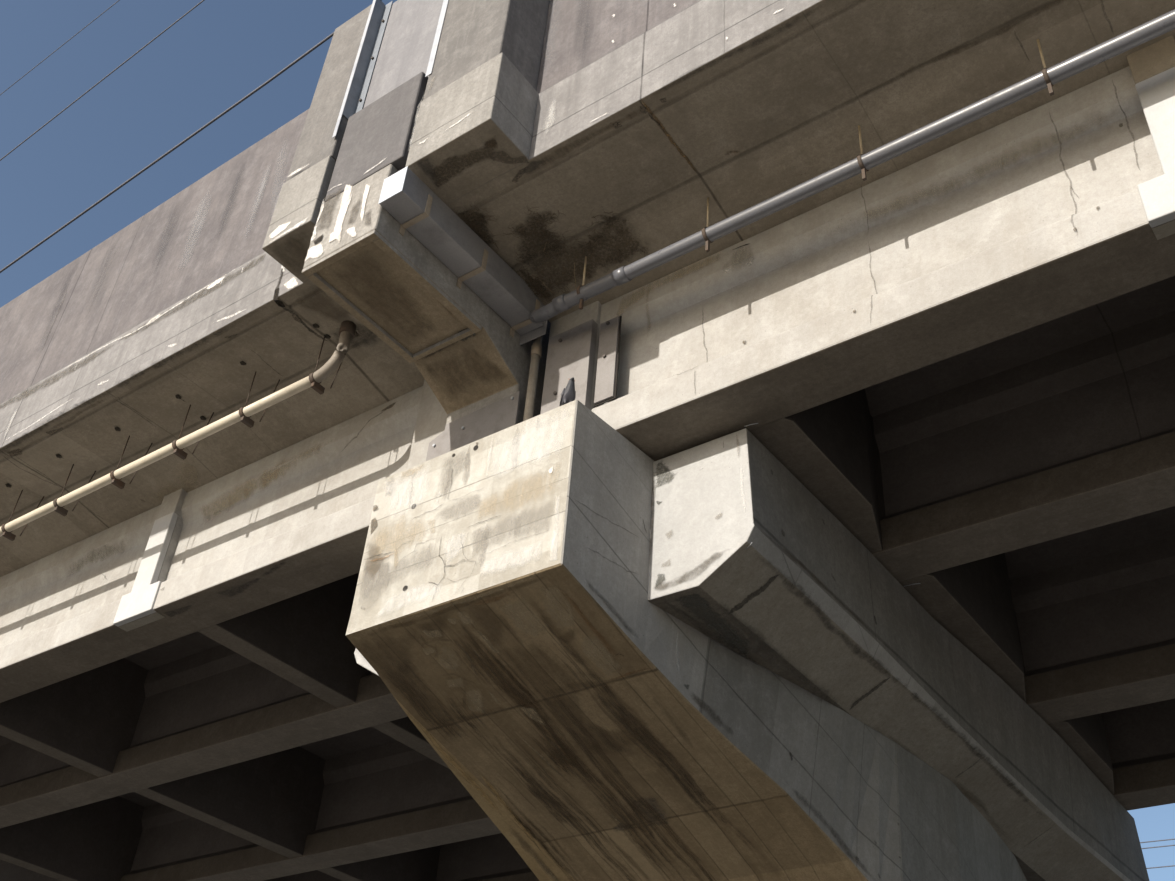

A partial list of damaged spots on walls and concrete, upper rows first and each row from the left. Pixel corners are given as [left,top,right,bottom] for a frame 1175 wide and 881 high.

crack [429,542,465,597]